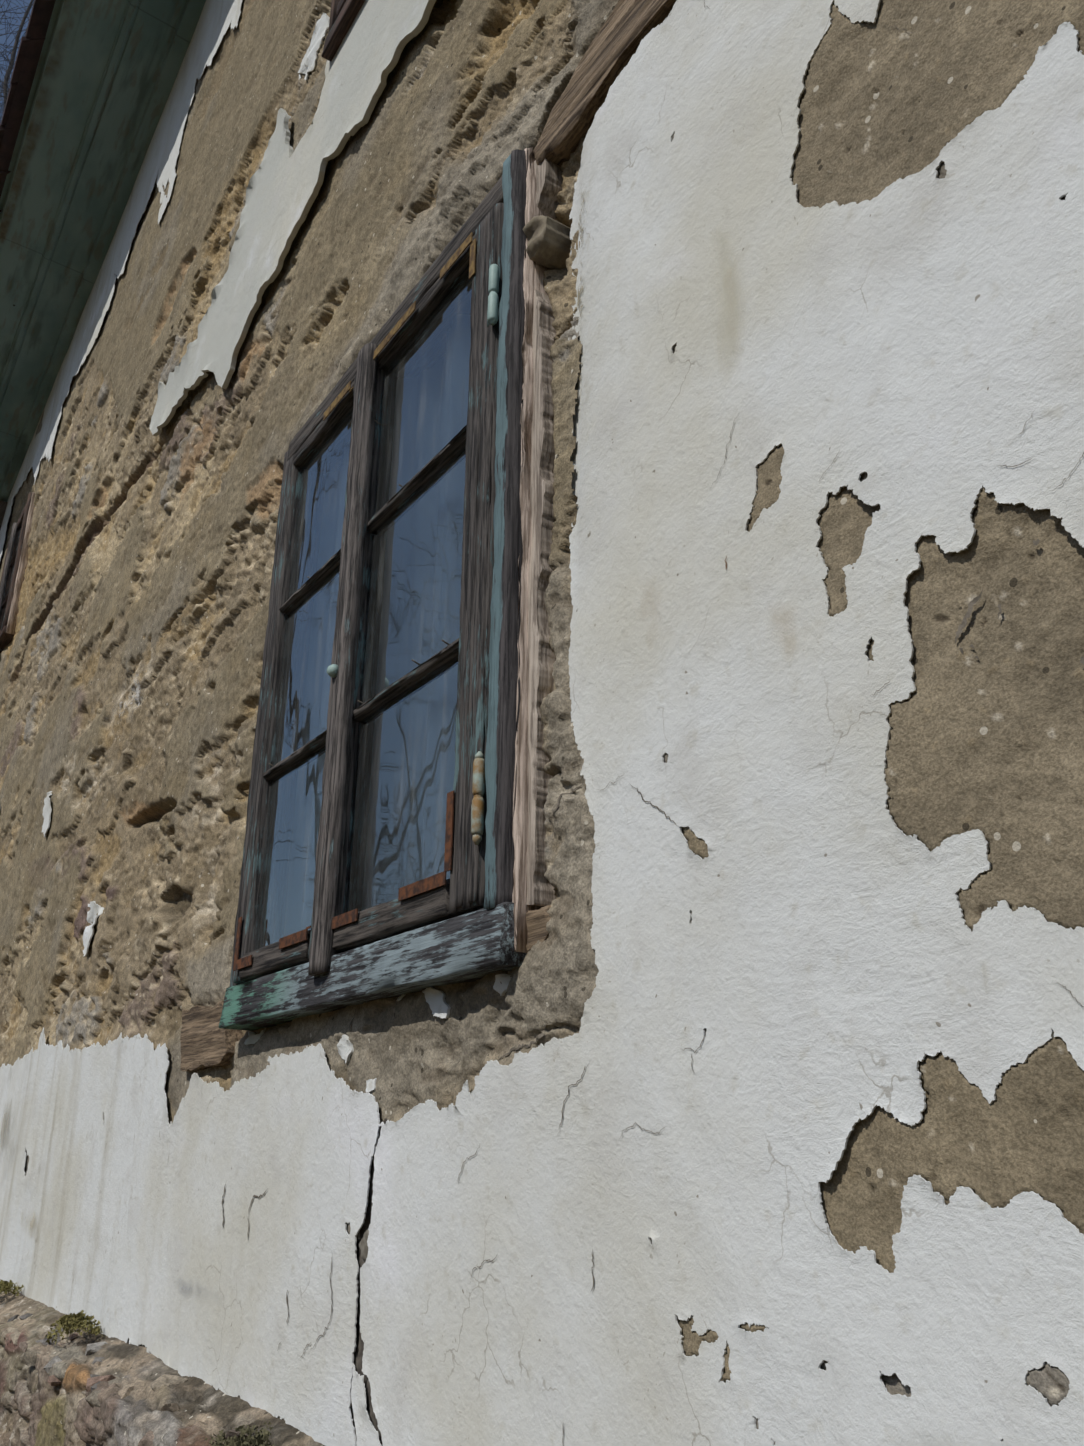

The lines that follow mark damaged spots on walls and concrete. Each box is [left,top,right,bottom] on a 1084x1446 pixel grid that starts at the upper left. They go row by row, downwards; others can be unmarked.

peeling [791,0,1084,208]
peeling [0,0,619,1124]
peeling [747,444,785,532]
peeling [817,472,881,617]
peeling [885,488,1084,932]
peeling [820,1033,1084,1273]
crack [277,1118,387,1446]
peeling [677,1316,731,1383]
spalling [739,1322,766,1332]
spalling [882,1373,911,1397]
spalling [1026,1362,1070,1407]